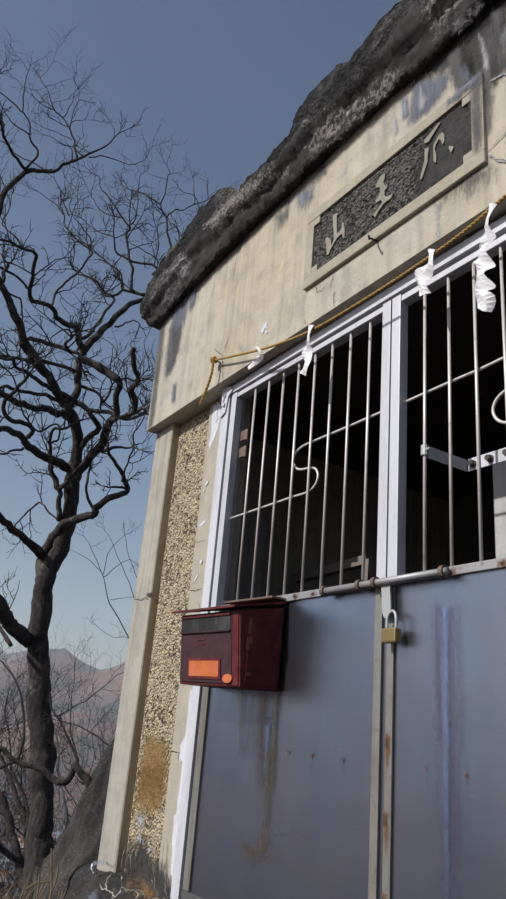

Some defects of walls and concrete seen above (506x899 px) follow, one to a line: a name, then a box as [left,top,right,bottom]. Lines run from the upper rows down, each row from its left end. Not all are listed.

damp [145,0,506,428]
damp [133,737,168,853]
crack [100,837,168,899]